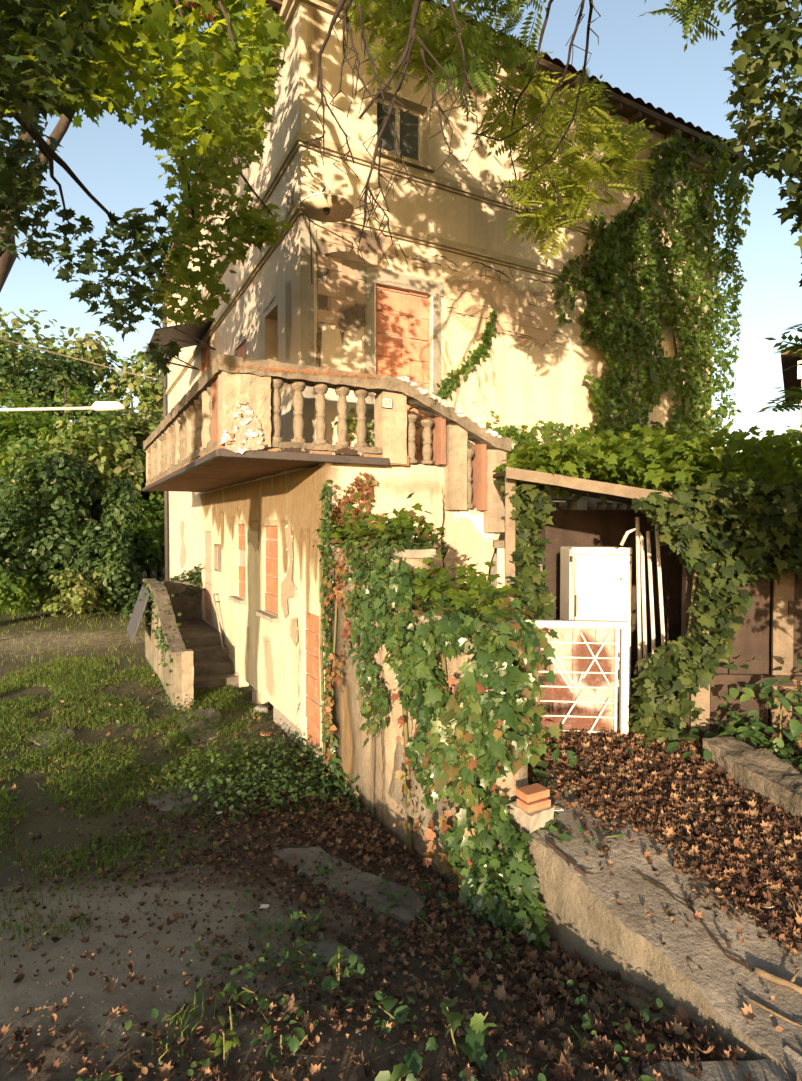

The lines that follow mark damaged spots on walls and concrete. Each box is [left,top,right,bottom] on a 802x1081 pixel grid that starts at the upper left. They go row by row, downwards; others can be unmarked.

leakage [334,222,383,252]
leakage [315,229,441,368]
spalling [317,222,568,347]
crack [397,239,554,283]
spalling [221,397,312,454]
leakage [200,463,329,617]